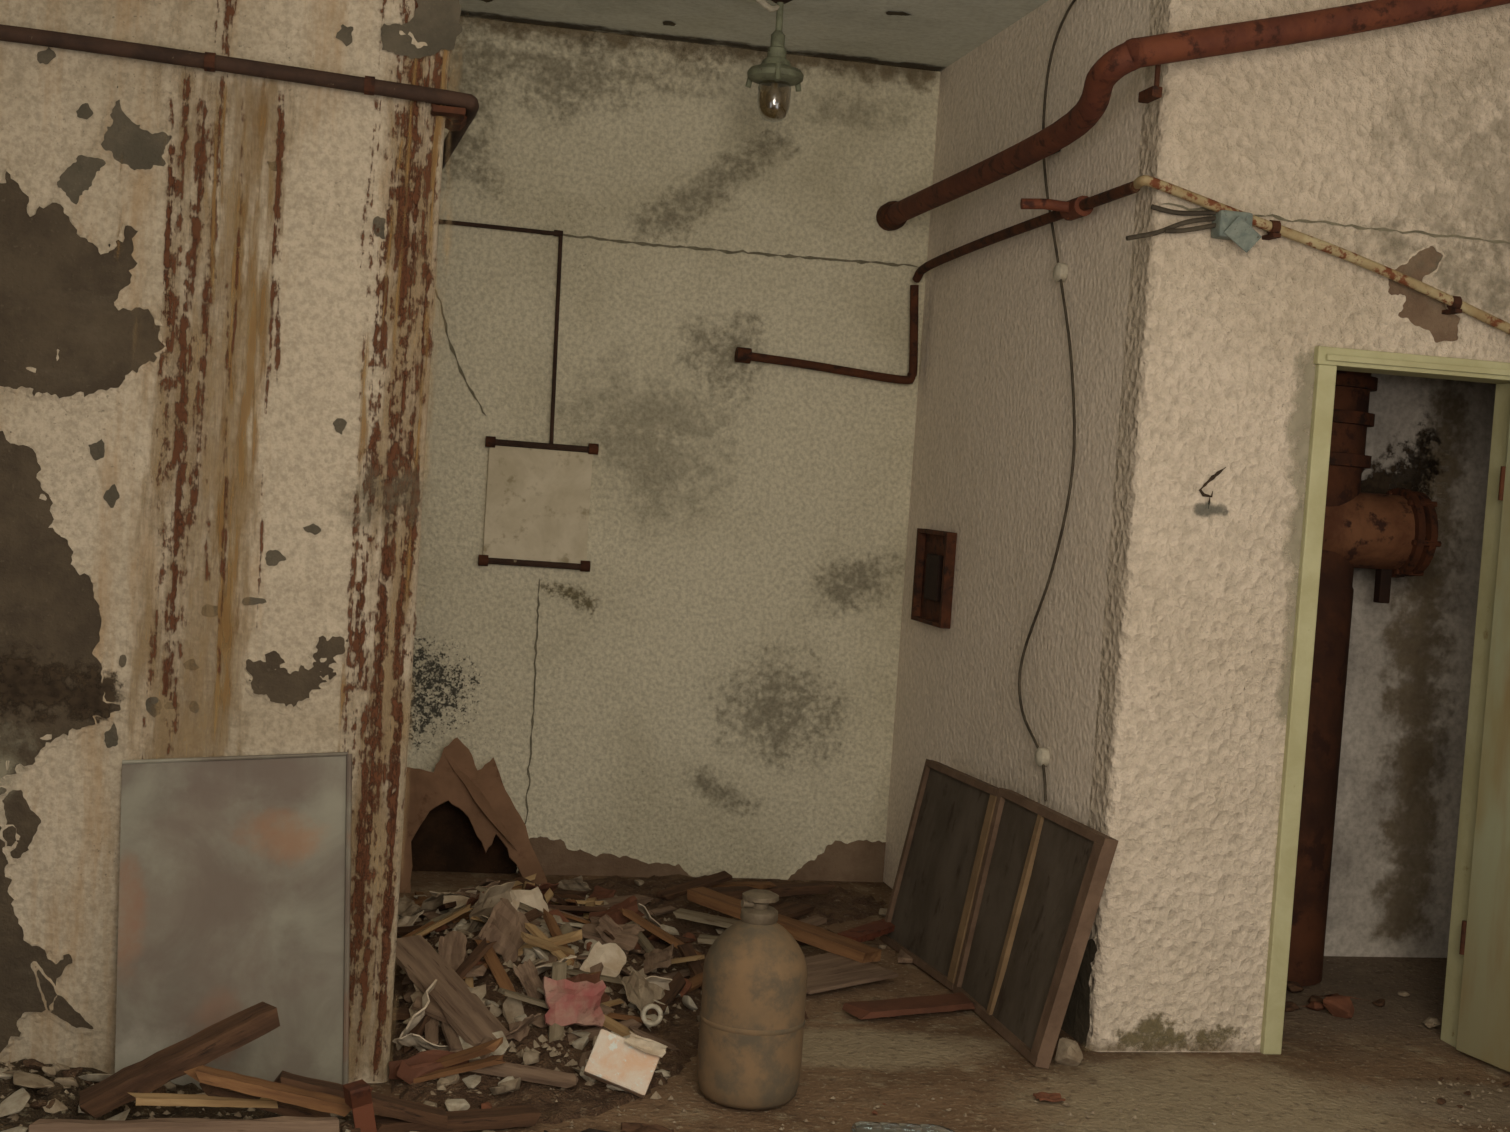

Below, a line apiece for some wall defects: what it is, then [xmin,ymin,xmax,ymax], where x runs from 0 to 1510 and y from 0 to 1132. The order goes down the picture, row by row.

rust [214,0,237,57]
rust [380,0,418,23]
flaking render [0,77,178,413]
crack [516,227,919,268]
crack [1255,214,1510,244]
rust [132,69,285,759]
crack [435,289,486,415]
rust [340,49,452,1132]
flaking render [0,426,199,1060]
flaking render [240,625,362,715]
damp [408,627,484,753]
flaking render [411,801,520,874]